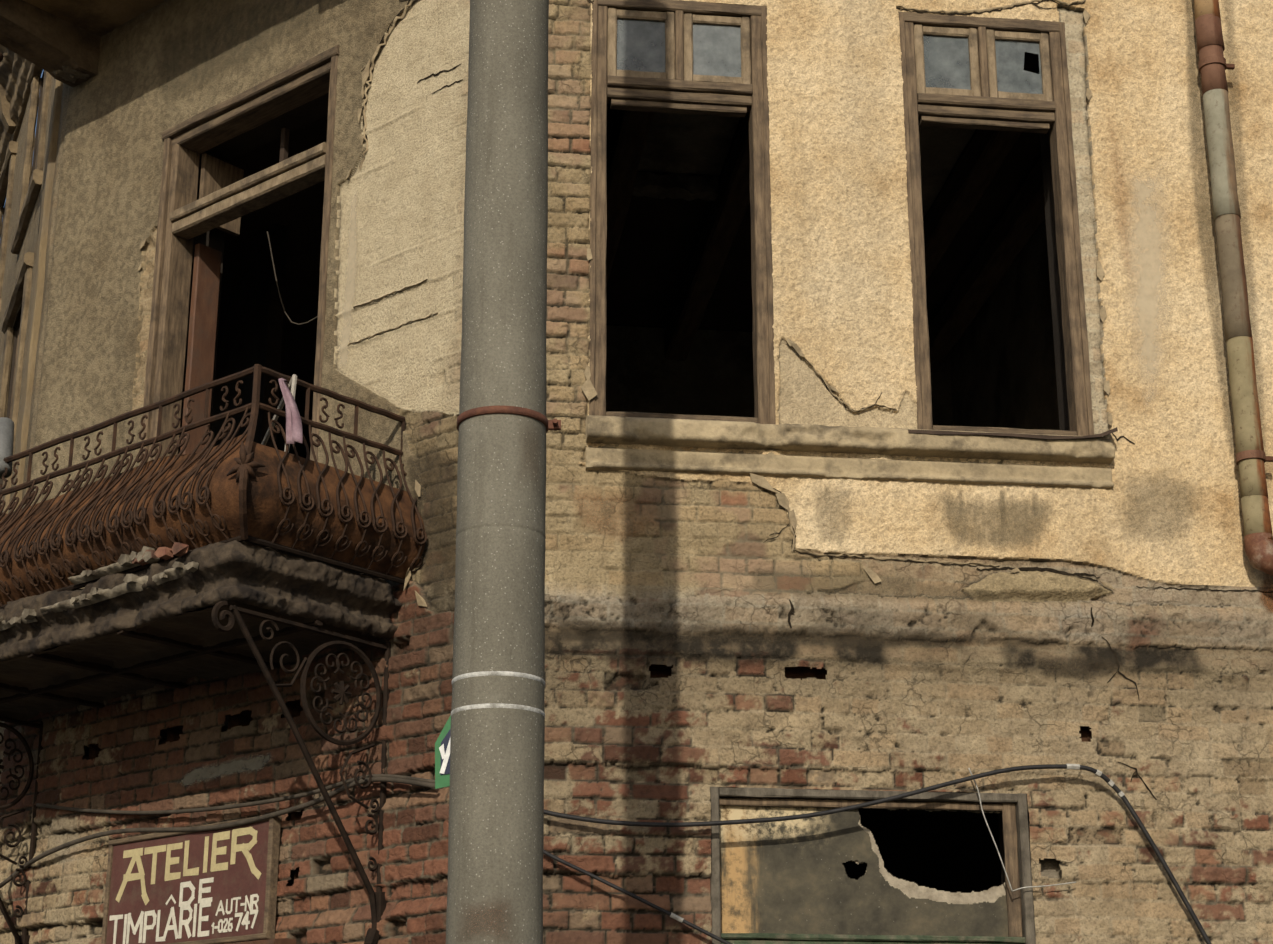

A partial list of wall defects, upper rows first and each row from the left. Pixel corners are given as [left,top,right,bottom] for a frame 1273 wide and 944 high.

crack [896,0,1086,15]
crack [359,0,415,169]
crack [417,64,463,94]
flaking render [545,0,881,599]
flaking render [778,338,917,429]
spalling [0,542,199,631]
crack [763,488,1140,701]
corrosion [1262,574,1273,611]
leakage [560,622,982,646]
spalling [649,664,673,678]
spalling [785,666,827,680]